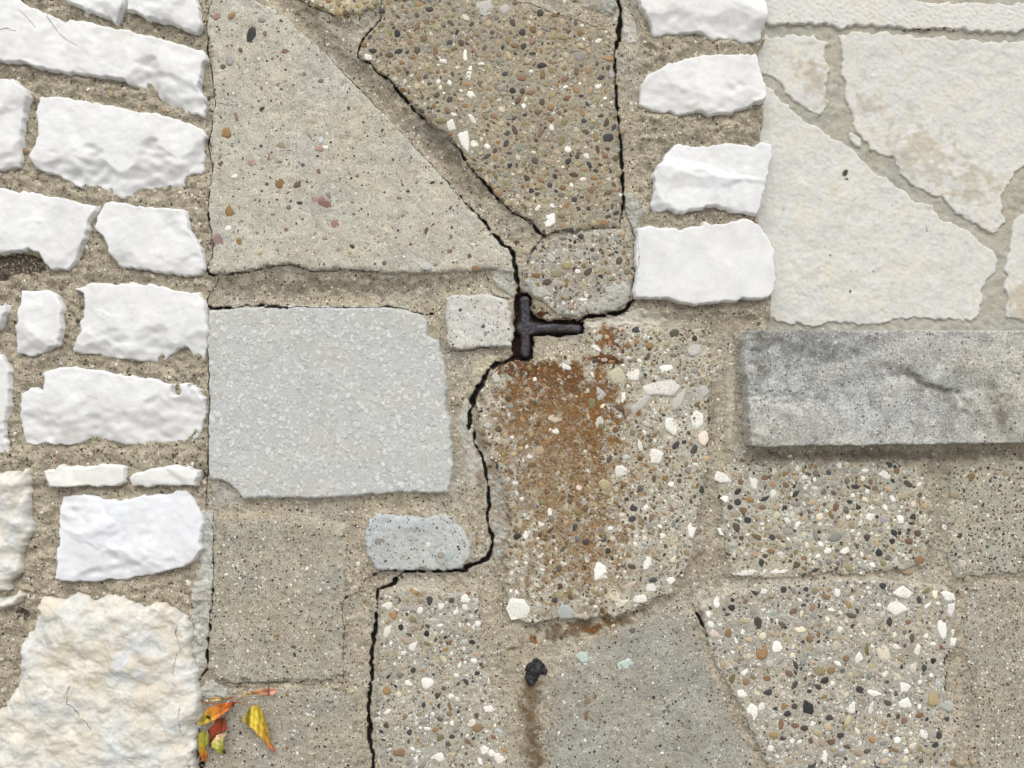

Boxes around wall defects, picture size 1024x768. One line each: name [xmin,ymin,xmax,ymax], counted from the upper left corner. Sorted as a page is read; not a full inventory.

crack [371,300,442,315]
crack [330,0,566,299]
crack [513,0,640,322]
corrosion [490,323,642,604]